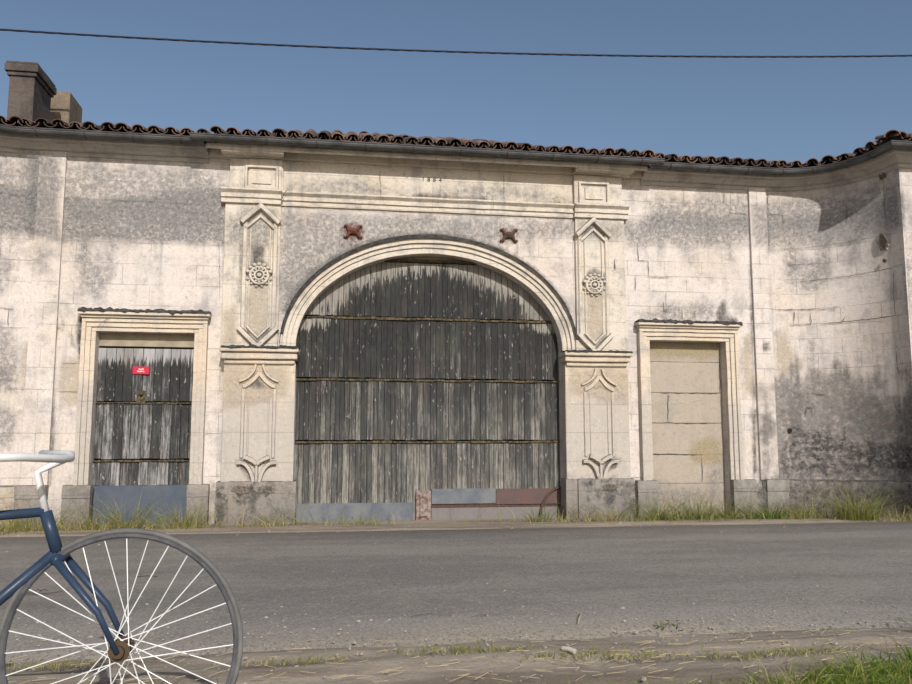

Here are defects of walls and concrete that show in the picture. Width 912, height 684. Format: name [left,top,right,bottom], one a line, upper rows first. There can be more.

damp [586,182,904,257]
spalling [877,233,890,263]
damp [761,333,912,517]